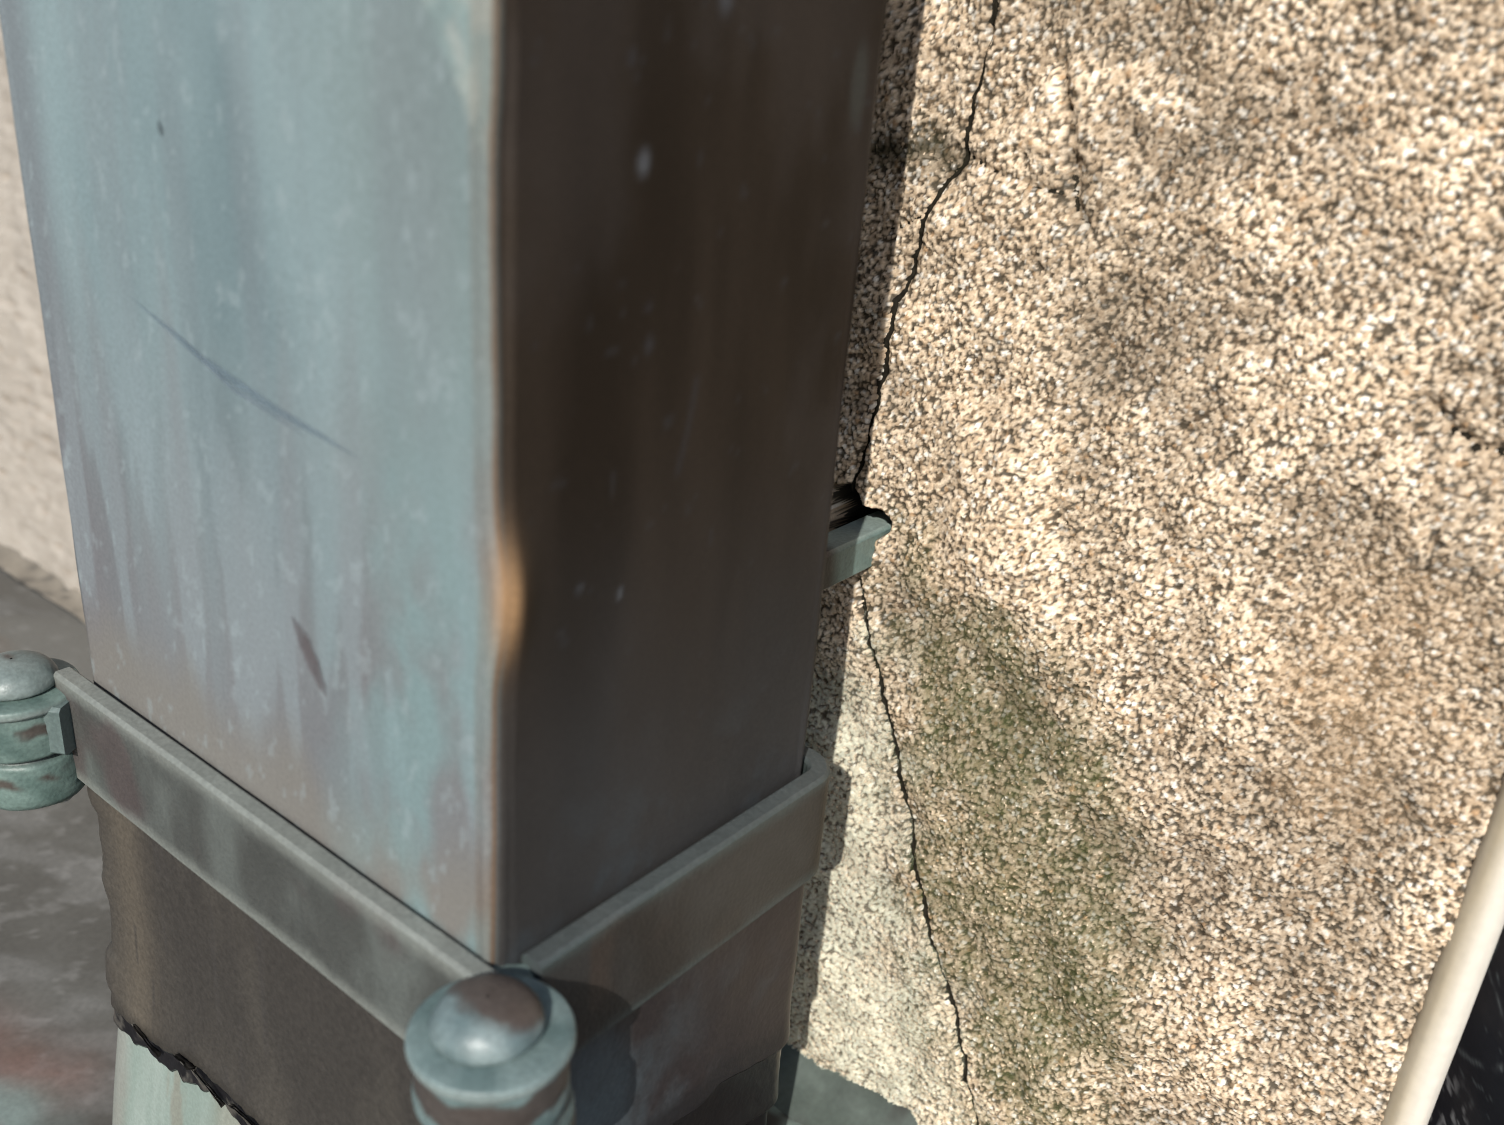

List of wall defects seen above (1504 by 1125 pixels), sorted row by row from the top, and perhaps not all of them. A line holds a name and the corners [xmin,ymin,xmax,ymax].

crack [851,0,999,491]
crack [1037,175,1088,223]
crack [860,579,979,1125]